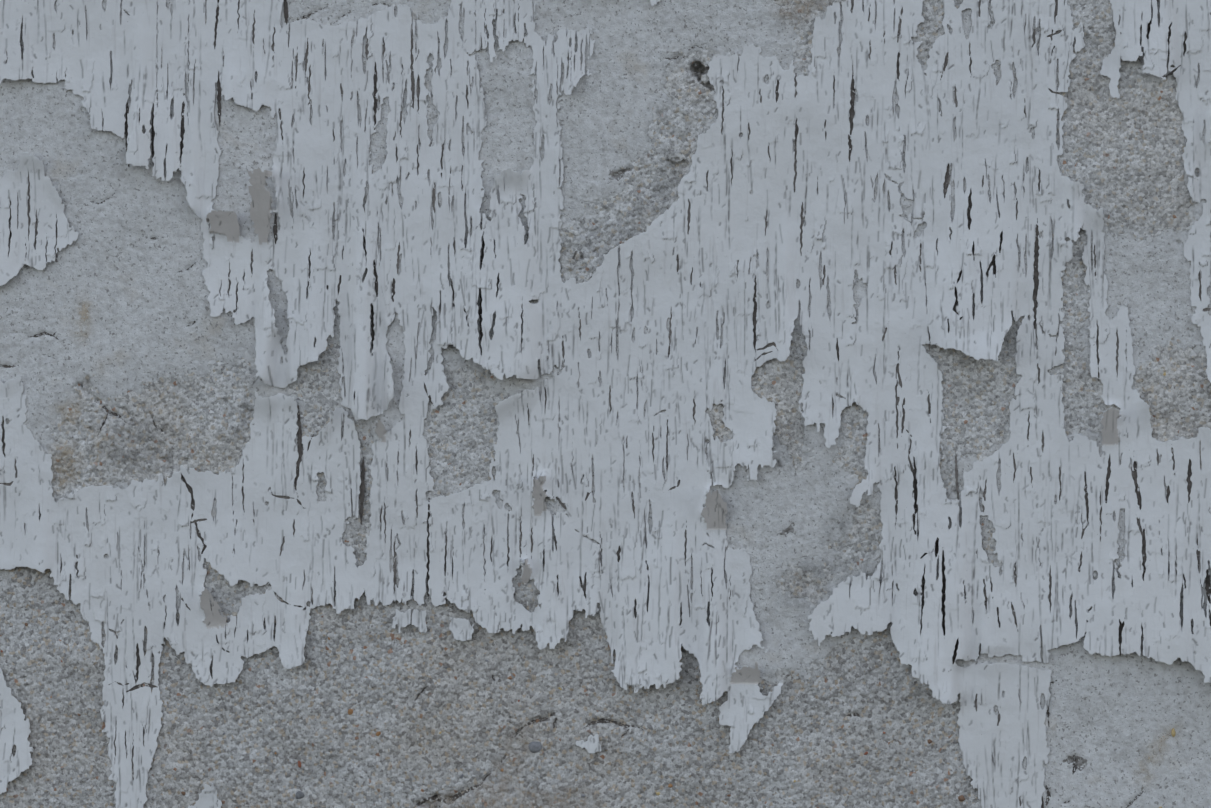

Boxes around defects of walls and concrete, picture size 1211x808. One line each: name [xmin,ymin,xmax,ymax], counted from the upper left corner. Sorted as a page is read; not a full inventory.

peeling [0,152,79,286]
peeling [126,123,151,169]
spalling [558,40,720,284]
spalling [1058,0,1211,383]
peeling [454,297,539,380]
peeling [932,294,1016,361]
spalling [41,351,259,502]
spalling [0,567,117,808]
peeling [323,579,377,614]
spalling [143,582,982,808]
peeling [899,609,1052,808]
peeling [1077,616,1120,657]